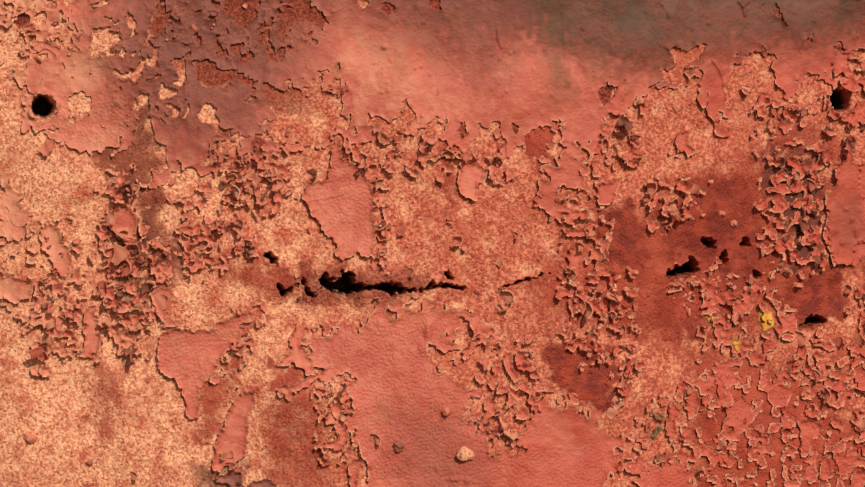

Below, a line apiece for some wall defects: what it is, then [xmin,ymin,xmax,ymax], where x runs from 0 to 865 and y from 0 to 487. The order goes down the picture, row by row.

spalling [170,24,202,95]
spalling [208,0,261,29]
spalling [215,26,258,64]
peeling [0,0,153,278]
corrosion [772,123,835,159]
corrosion [95,105,182,289]
crack [301,269,465,298]
crack [503,273,542,288]
corrosion [538,153,848,342]
peeling [787,209,831,271]
corrosion [542,340,620,410]
corrosion [694,355,865,487]